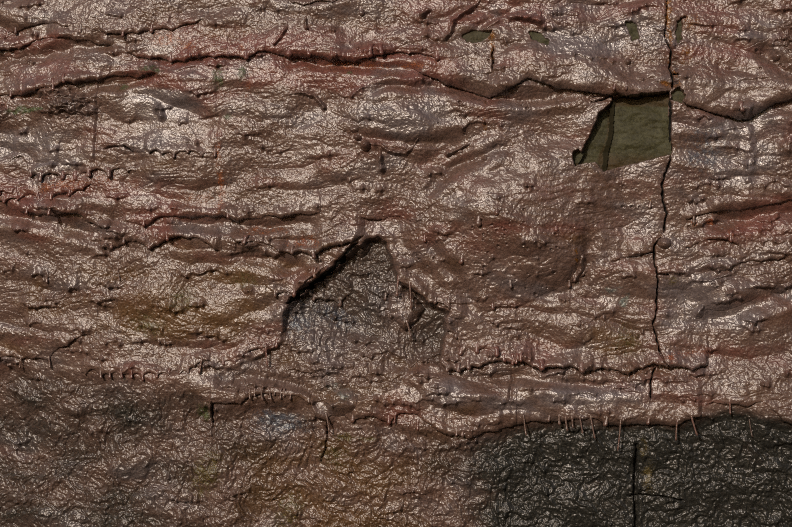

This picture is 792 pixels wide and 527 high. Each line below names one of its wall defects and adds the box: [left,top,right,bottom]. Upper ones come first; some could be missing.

spalling [462,31,491,43]
spalling [529,32,549,45]
spalling [625,22,639,41]
spalling [573,89,685,172]
crack [593,7,686,398]
crack [287,242,359,304]